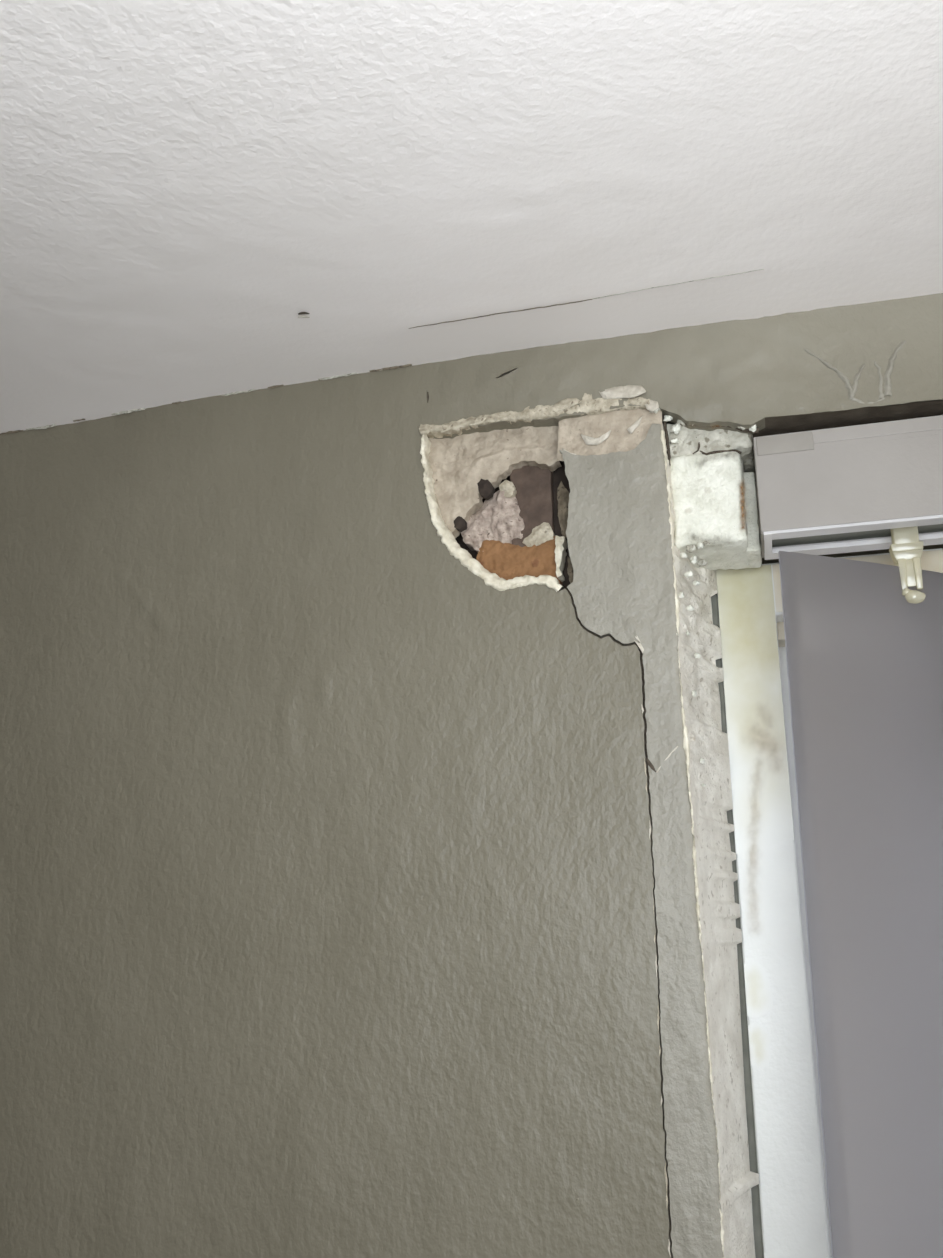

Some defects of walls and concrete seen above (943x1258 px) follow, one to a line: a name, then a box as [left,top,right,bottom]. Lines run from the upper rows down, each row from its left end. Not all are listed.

flaking render [418,385,725,1258]
crack [567,589,678,1258]